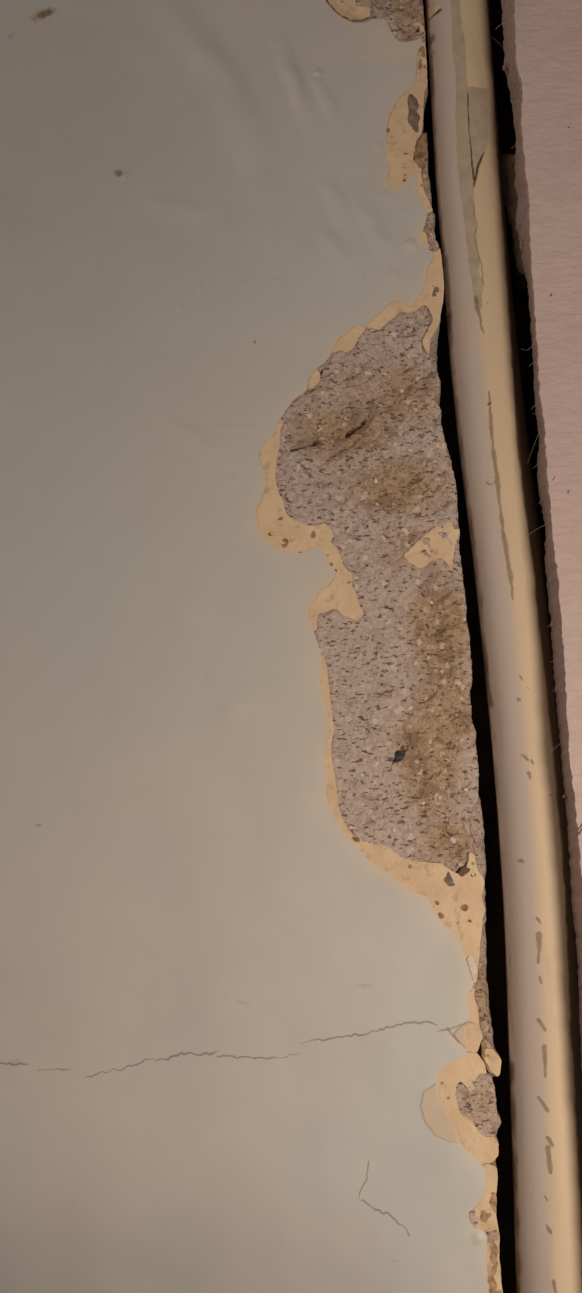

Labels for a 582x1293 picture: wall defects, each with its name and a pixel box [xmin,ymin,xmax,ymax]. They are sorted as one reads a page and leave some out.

spalling [256,0,503,1293]